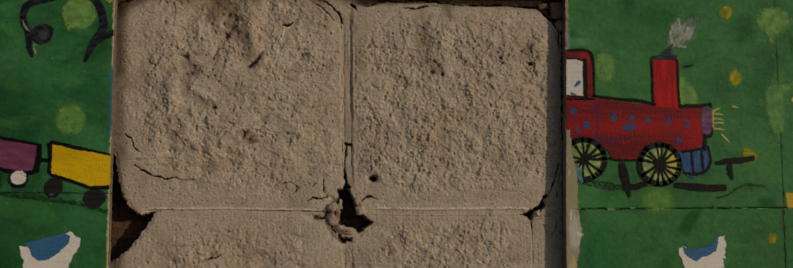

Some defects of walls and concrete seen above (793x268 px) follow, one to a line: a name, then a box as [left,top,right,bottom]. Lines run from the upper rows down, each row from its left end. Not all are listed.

crack [317,0,498,23]
crack [523,7,563,235]
crack [283,143,376,219]
spalling [324,199,343,240]